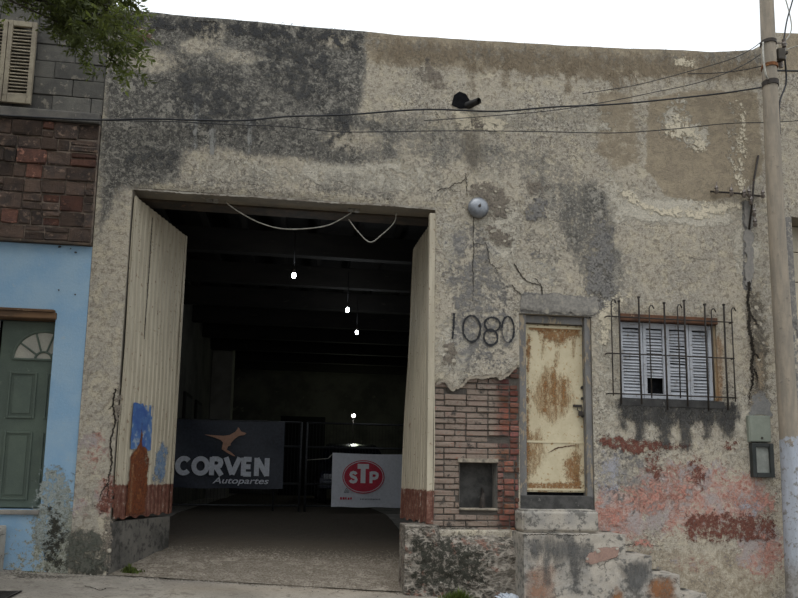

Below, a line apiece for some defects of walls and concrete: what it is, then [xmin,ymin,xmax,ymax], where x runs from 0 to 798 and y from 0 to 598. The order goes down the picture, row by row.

spalling [664,110,707,153]
spalling [727,100,749,194]
spalling [617,190,742,220]
crack [472,217,543,301]
crack [746,281,761,400]
rust [126,430,149,515]
flaking render [433,365,519,530]
rust [526,324,585,492]
water stain [618,401,740,451]
spalling [596,433,781,571]
water stain [532,540,592,592]
water stain [623,564,648,591]